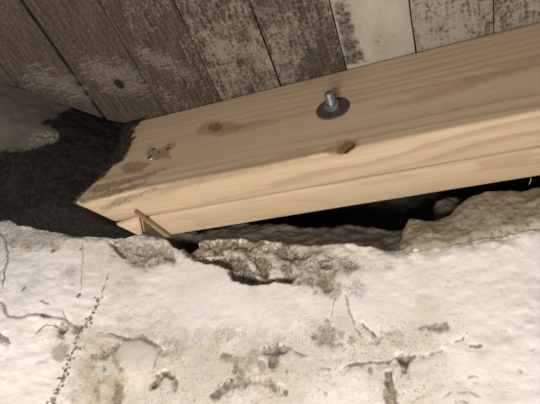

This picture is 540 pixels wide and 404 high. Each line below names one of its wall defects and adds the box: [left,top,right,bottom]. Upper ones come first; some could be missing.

damp [336,3,363,64]
crack [0,234,15,289]
spalling [181,240,359,300]
crack [0,274,169,404]
crack [331,297,376,340]
damp [210,344,308,402]